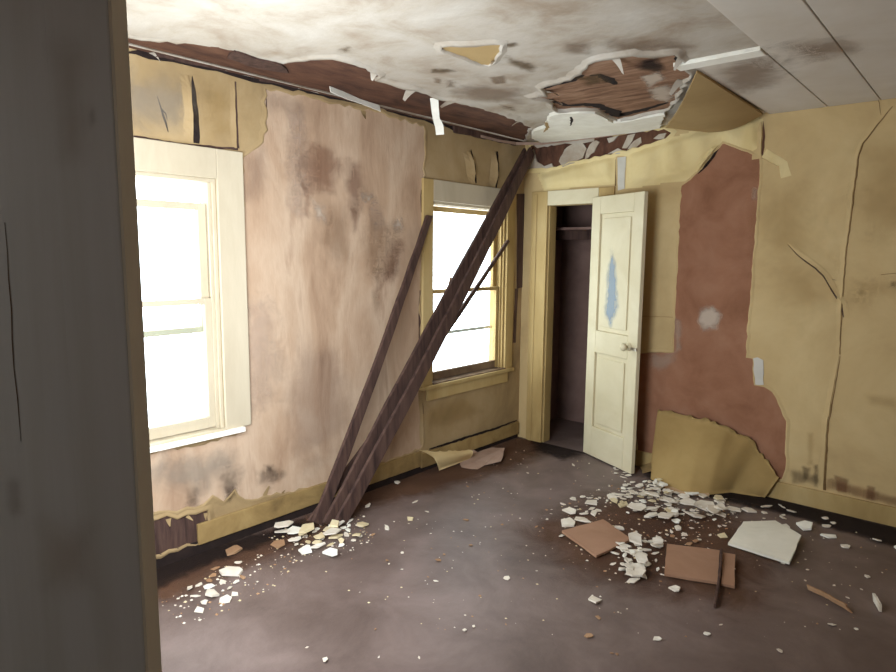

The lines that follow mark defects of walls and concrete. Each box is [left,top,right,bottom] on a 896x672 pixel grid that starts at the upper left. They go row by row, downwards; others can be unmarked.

crack [157,74,200,144]
spalling [128,35,697,173]
leakage [640,59,670,101]
crack [788,241,849,317]
crack [4,222,21,439]
spalling [154,504,215,559]